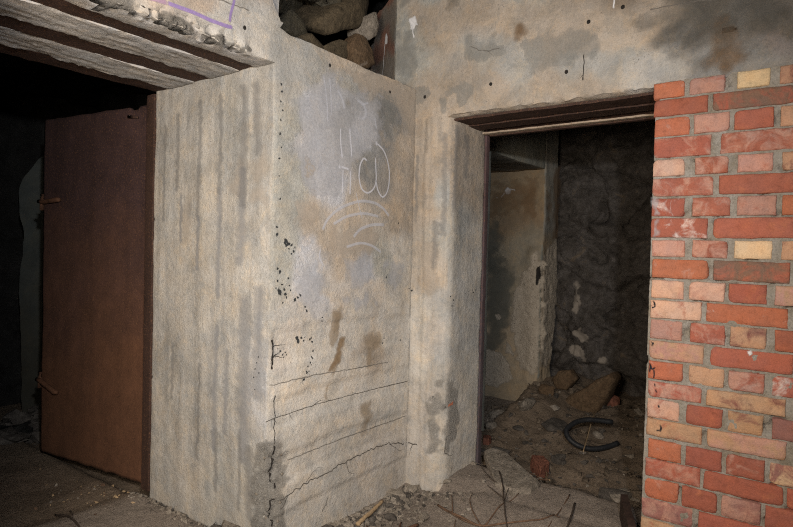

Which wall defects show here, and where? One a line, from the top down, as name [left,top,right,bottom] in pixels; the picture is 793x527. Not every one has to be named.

spalling [89,0,251,53]
corrosion [329,338,344,370]
crack [266,340,407,444]
spalling [485,239,558,388]
crack [280,416,417,509]